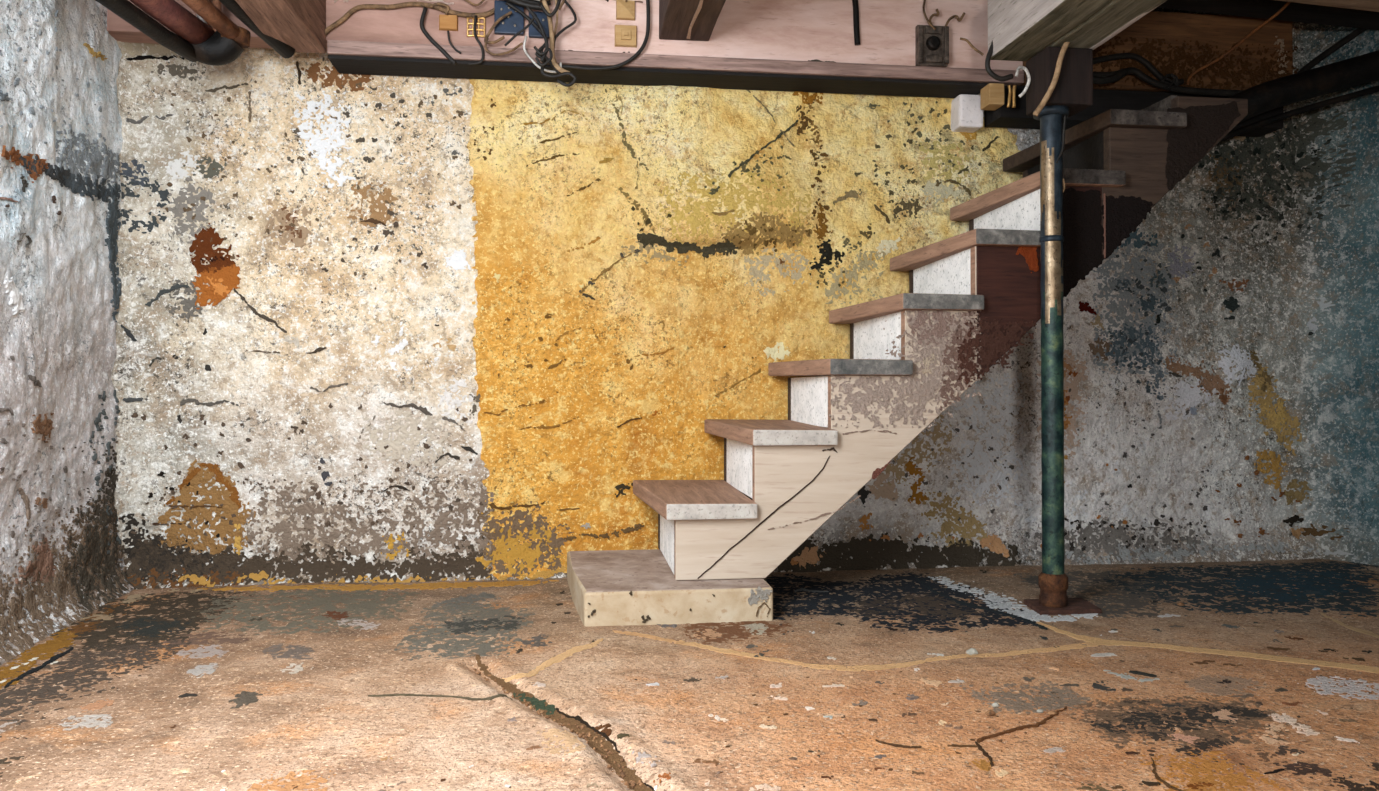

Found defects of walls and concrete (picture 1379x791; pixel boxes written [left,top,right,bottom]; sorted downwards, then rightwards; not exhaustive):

crack [294,61,302,85]
crack [874,204,890,224]
spalling [890,198,923,219]
corrosion [189,223,241,310]
crack [359,84,800,463]
peeling [825,251,886,304]
spalling [1223,297,1240,312]
crack [233,289,348,392]
spalling [1283,515,1304,541]
crack [368,655,654,791]
leakage [959,660,1379,791]
leakage [247,770,336,791]